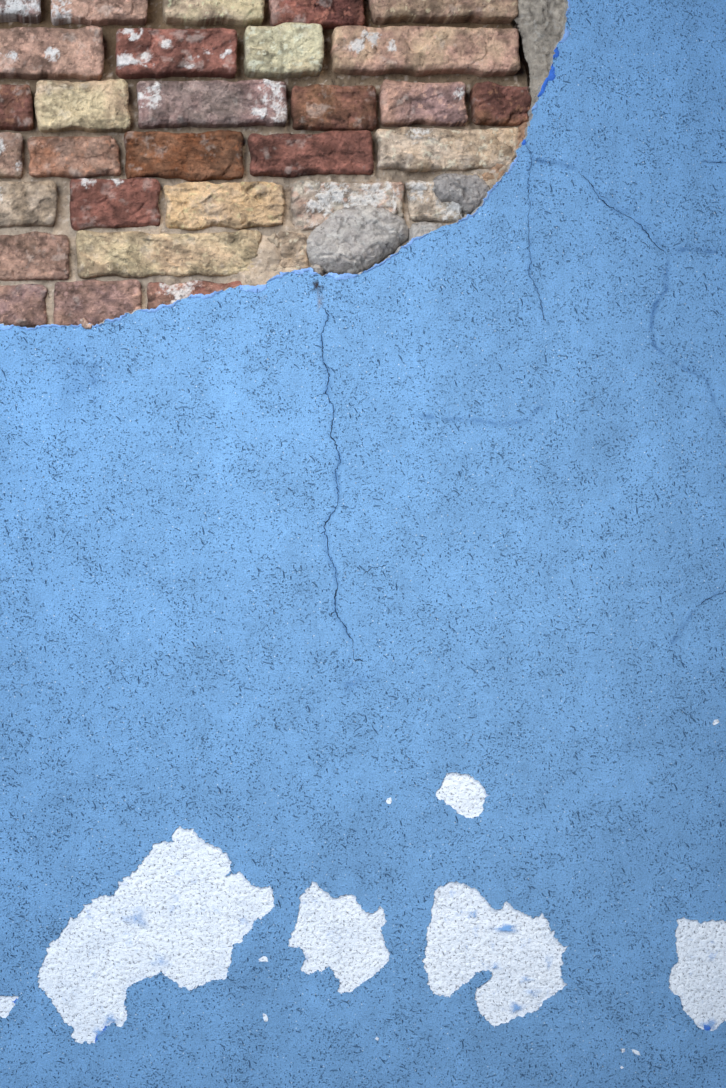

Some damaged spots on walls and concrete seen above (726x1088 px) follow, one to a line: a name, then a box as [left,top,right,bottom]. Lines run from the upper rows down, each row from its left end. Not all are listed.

spalling [0,0,571,330]
crack [315,292,367,662]
peeling [435,770,490,818]
peeling [0,994,20,1018]
peeling [37,824,275,1044]
peeling [288,880,391,994]
peeling [422,880,569,1028]
peeling [668,917,726,1031]